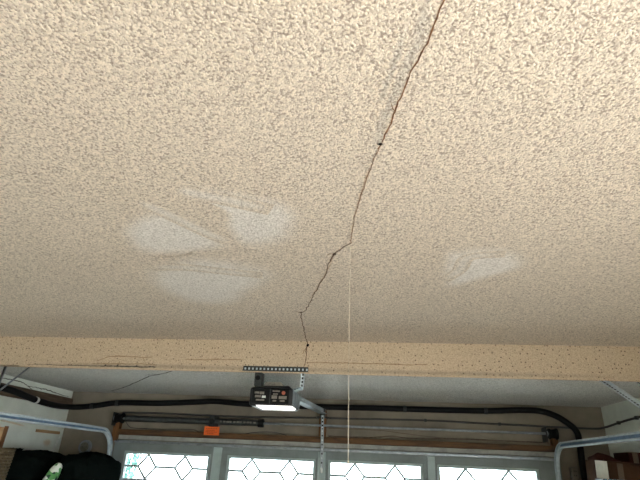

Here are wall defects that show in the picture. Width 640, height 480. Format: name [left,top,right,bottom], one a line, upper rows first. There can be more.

leakage [111,179,309,309]
crack [299,0,445,366]